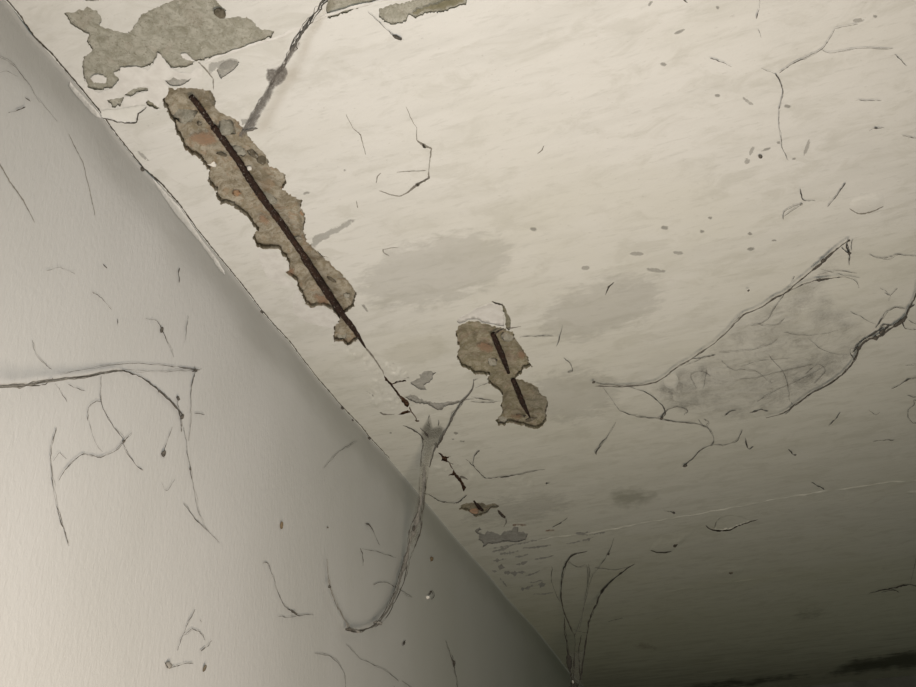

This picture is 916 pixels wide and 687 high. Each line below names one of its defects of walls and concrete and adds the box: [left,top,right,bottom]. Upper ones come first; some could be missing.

crack [0,164,34,221]
crack [6,0,386,455]
spalling [64,0,467,413]
crack [376,107,432,197]
crack [366,348,419,422]
spalling [456,303,548,429]
crack [439,453,468,491]
flaking render [432,457,554,595]